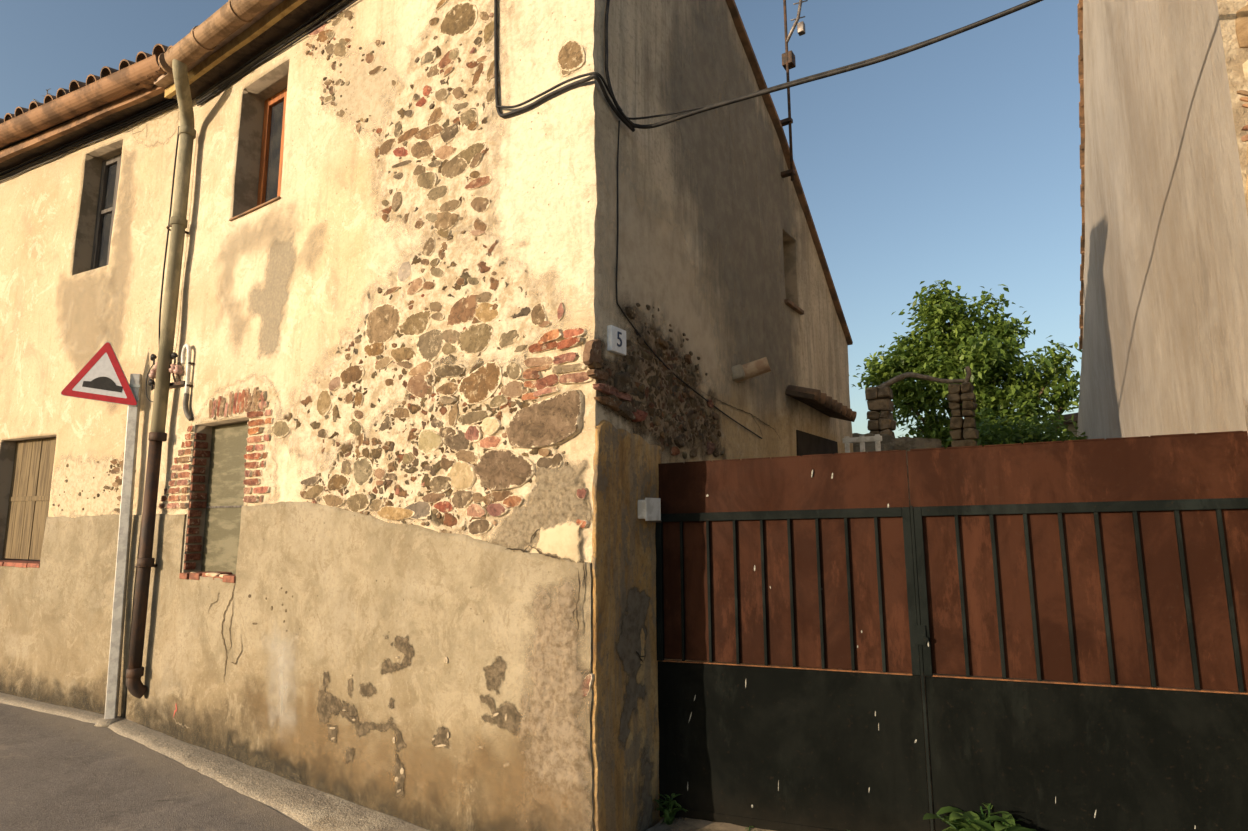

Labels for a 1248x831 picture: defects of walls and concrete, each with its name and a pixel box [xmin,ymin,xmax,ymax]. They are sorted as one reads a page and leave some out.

spalling [157,0,726,538]
crack [208,577,242,675]
peeling [317,635,414,797]
peeling [480,656,522,736]